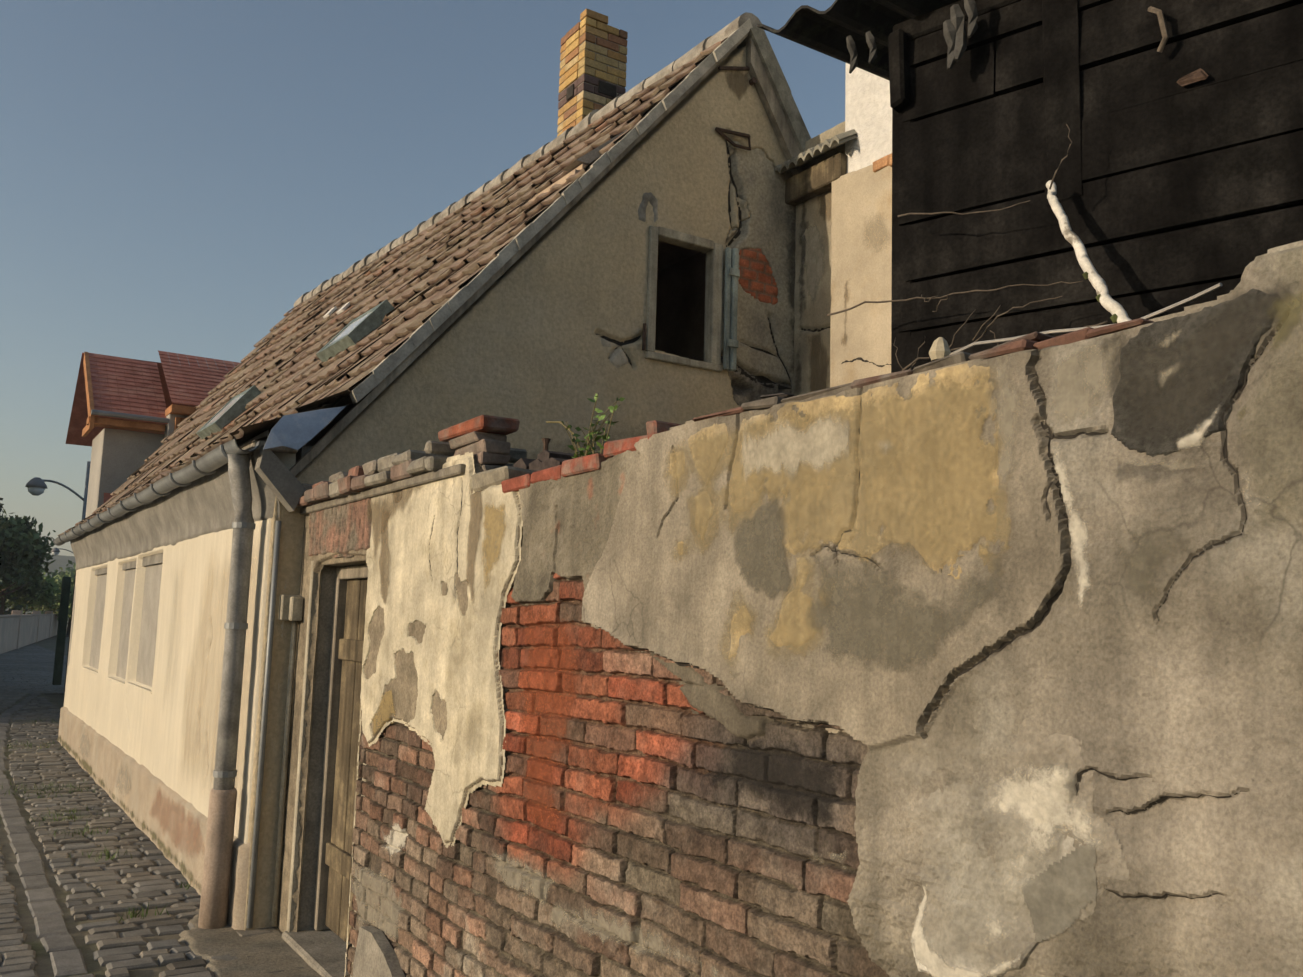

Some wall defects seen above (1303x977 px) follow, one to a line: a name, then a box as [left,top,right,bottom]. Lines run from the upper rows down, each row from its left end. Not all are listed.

crack [726,140,742,247]
flaking render [738,248,778,305]
crack [596,334,641,366]
peeling [668,356,1010,652]
crack [813,530,879,567]
crack [927,358,1108,723]
crack [1156,314,1289,621]
spalling [344,450,1130,977]
crack [1075,768,1248,815]